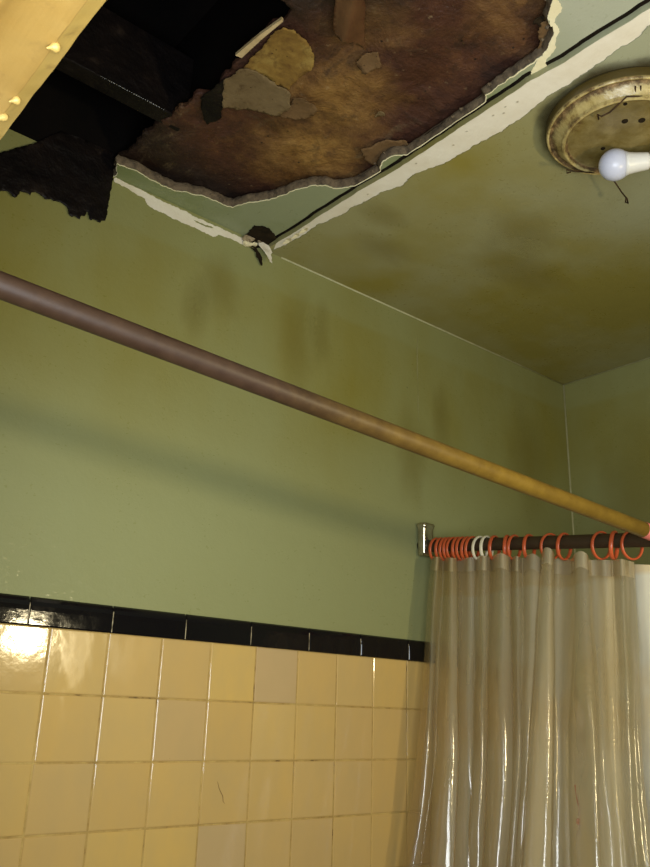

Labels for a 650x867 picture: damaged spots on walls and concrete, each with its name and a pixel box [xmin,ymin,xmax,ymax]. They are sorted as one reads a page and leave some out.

peeling [113,0,650,266]